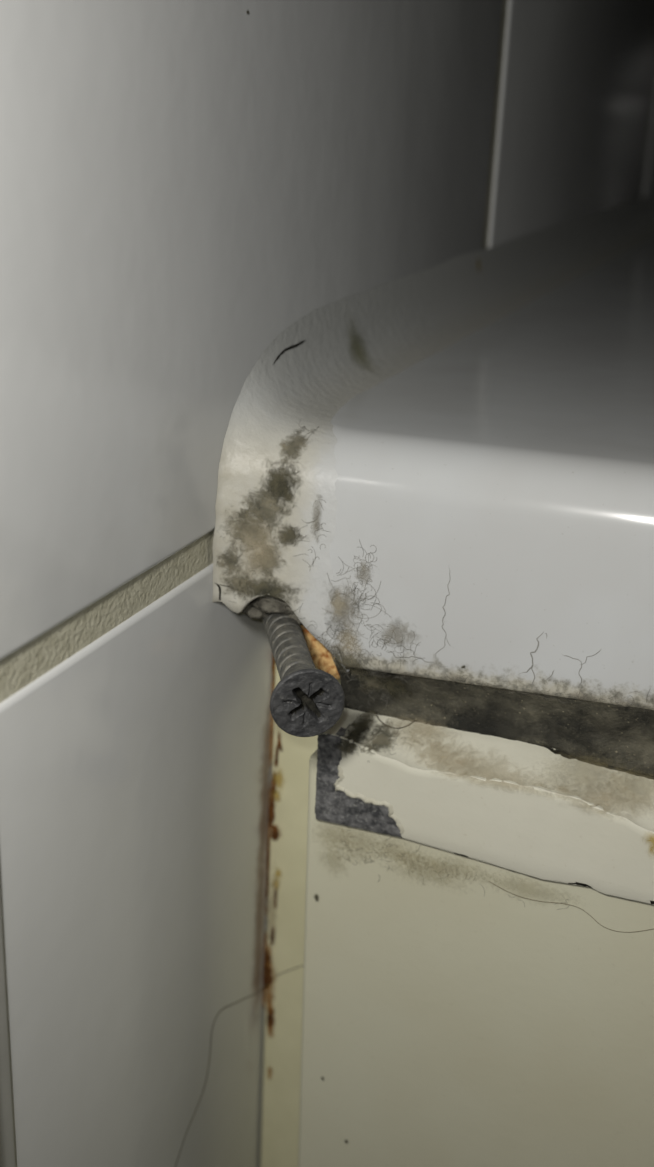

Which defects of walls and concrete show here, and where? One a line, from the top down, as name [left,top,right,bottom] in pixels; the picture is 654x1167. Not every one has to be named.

leakage [219,426,319,599]
peeling [315,724,405,838]
rust [256,715,283,1035]